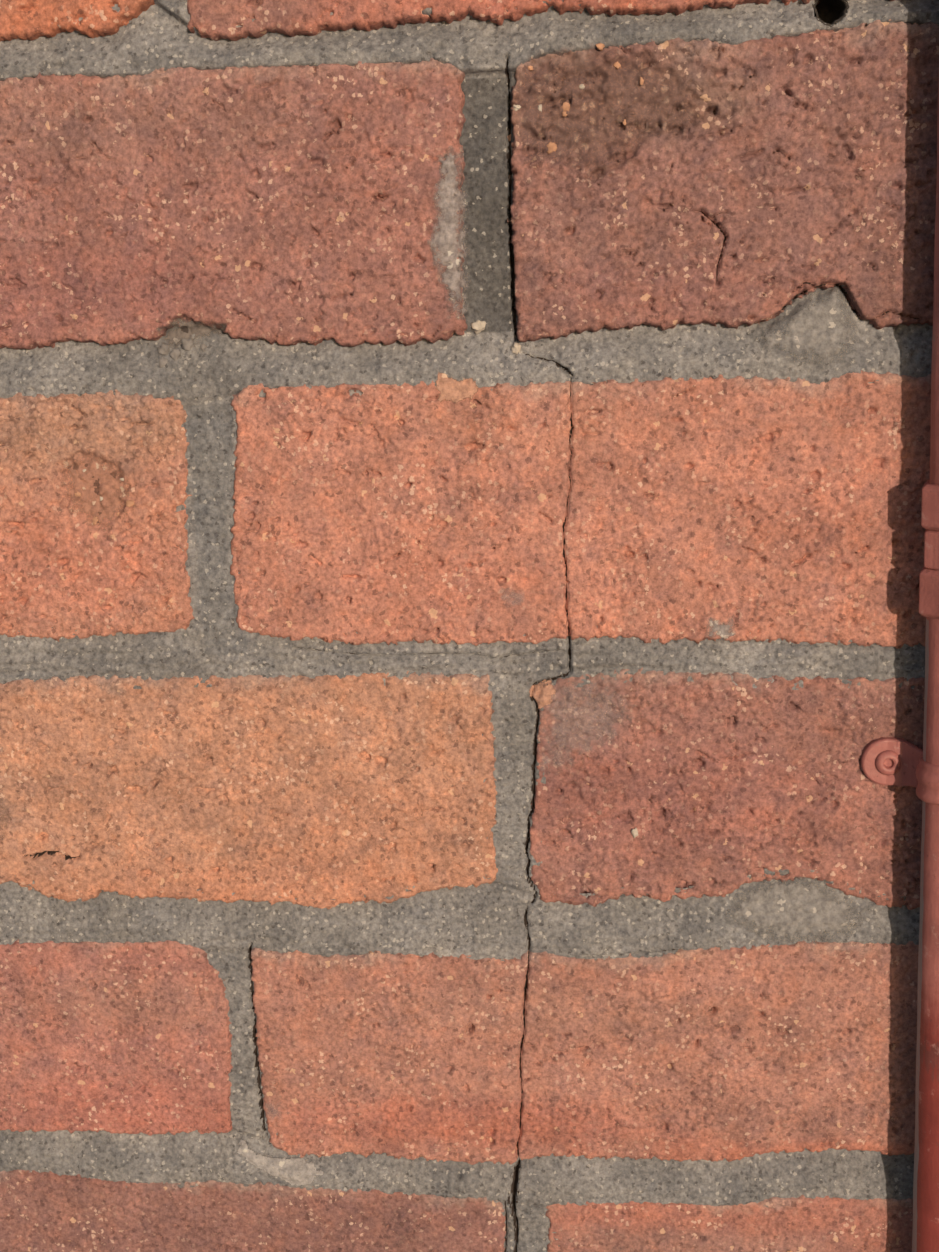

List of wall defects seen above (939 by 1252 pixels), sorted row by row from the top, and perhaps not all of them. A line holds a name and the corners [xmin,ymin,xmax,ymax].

crack [248,945,271,1144]
crack [493,57,573,1252]